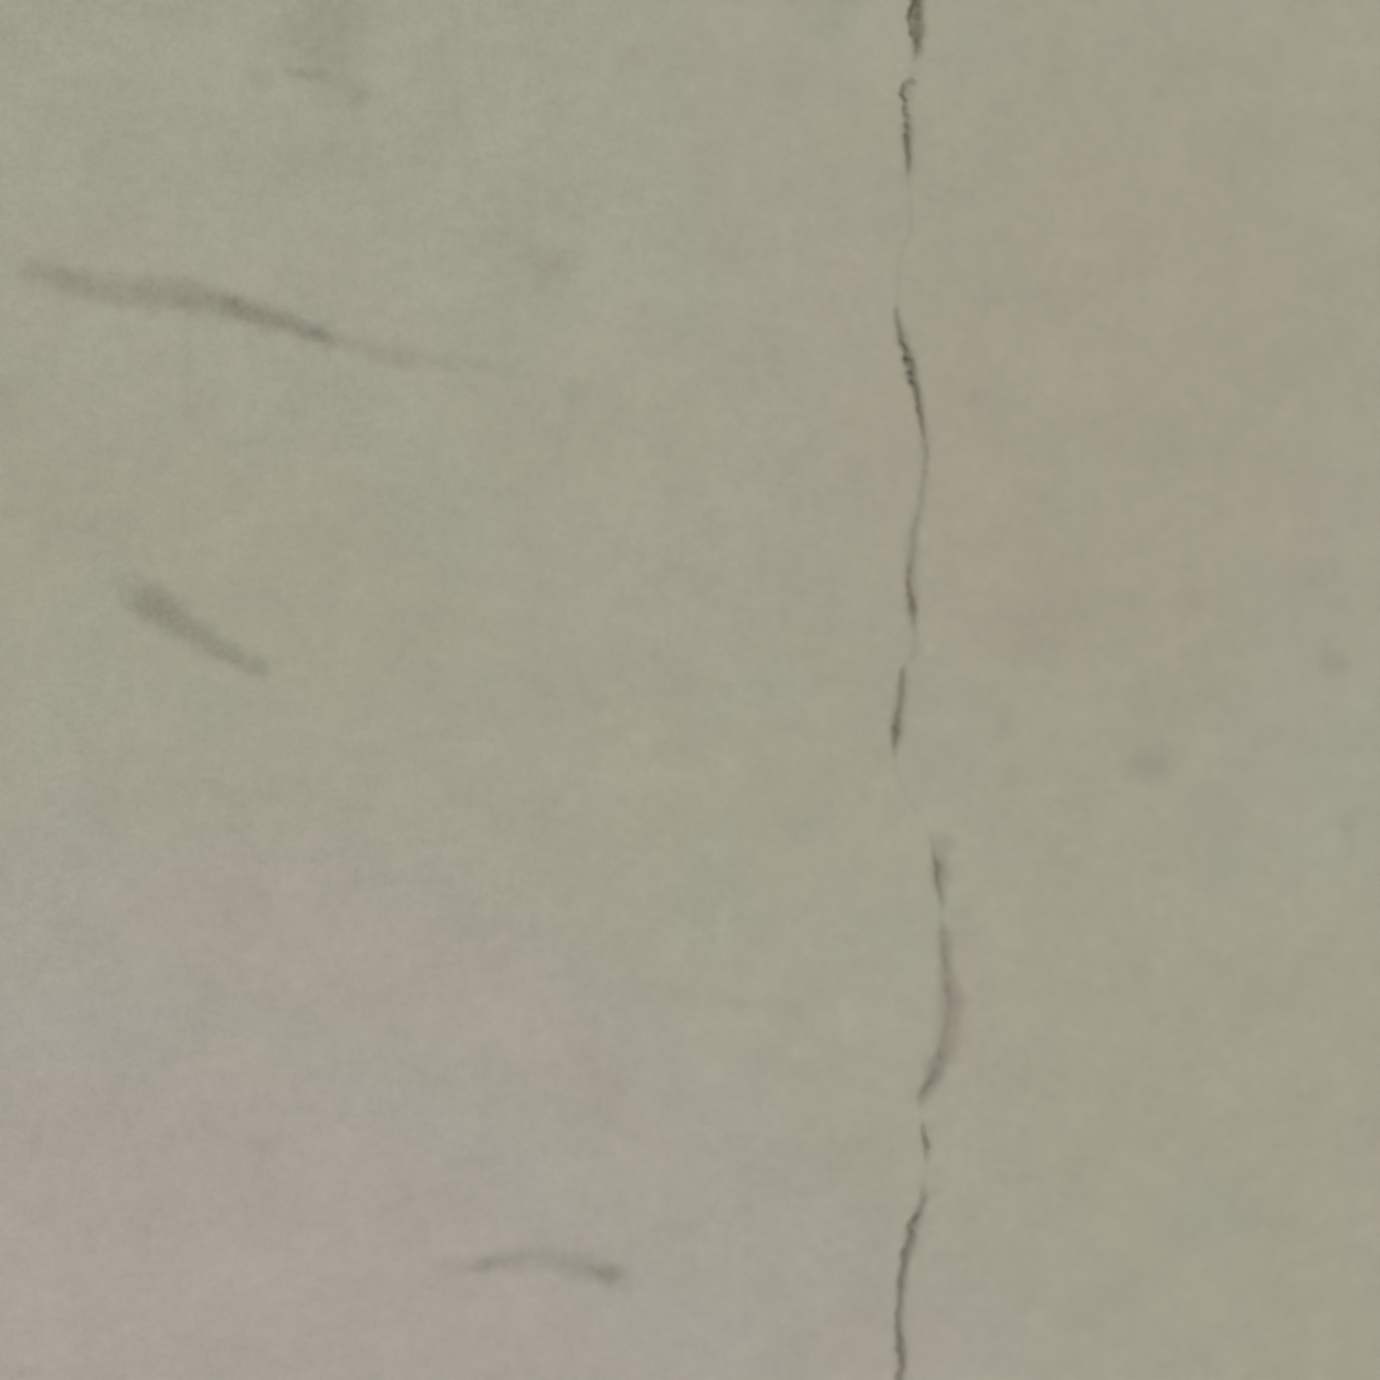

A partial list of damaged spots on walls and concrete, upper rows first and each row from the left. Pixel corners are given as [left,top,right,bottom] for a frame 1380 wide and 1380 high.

crack [896,0,921,176]
crack [895,315,925,440]
crack [892,529,939,753]
crack [932,851,951,901]
crack [900,1065,937,1159]
crack [888,1203,923,1380]